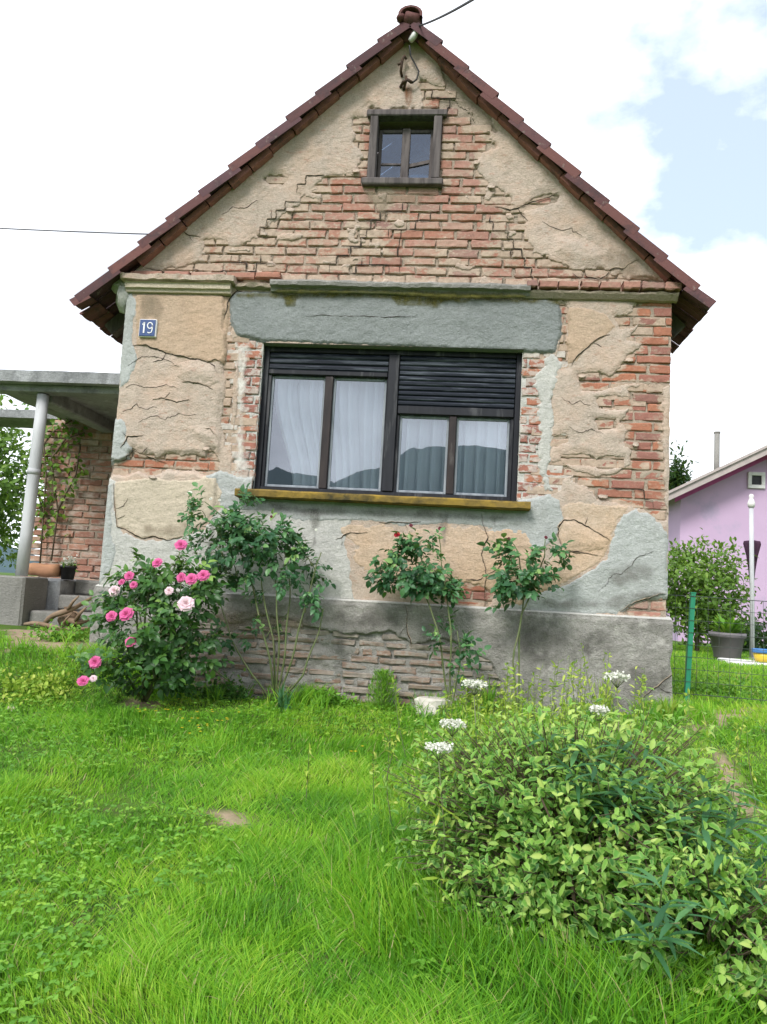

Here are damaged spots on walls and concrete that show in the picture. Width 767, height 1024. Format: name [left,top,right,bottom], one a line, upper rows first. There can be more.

spalling [165,70,657,290]
crack [489,192,582,279]
crack [574,259,637,280]
crack [113,344,224,462]
spalling [341,303,672,607]
crack [113,486,180,541]
crack [557,519,609,558]
crack [620,593,660,612]
flaking render [178,614,502,710]